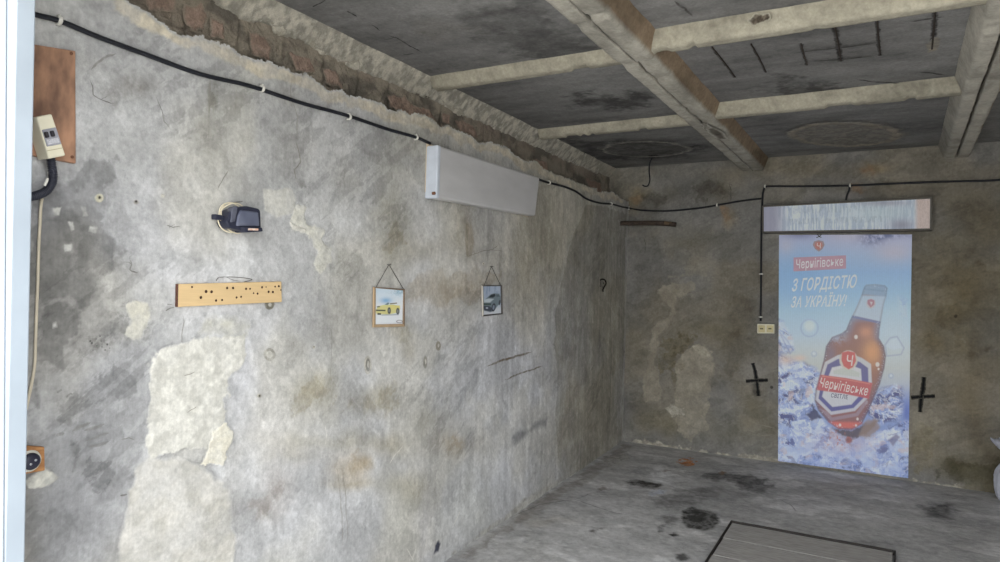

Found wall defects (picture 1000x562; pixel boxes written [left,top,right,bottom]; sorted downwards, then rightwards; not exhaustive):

spalling [112,0,624,204]
peeling [200,422,234,467]
water stain [450,204,780,562]